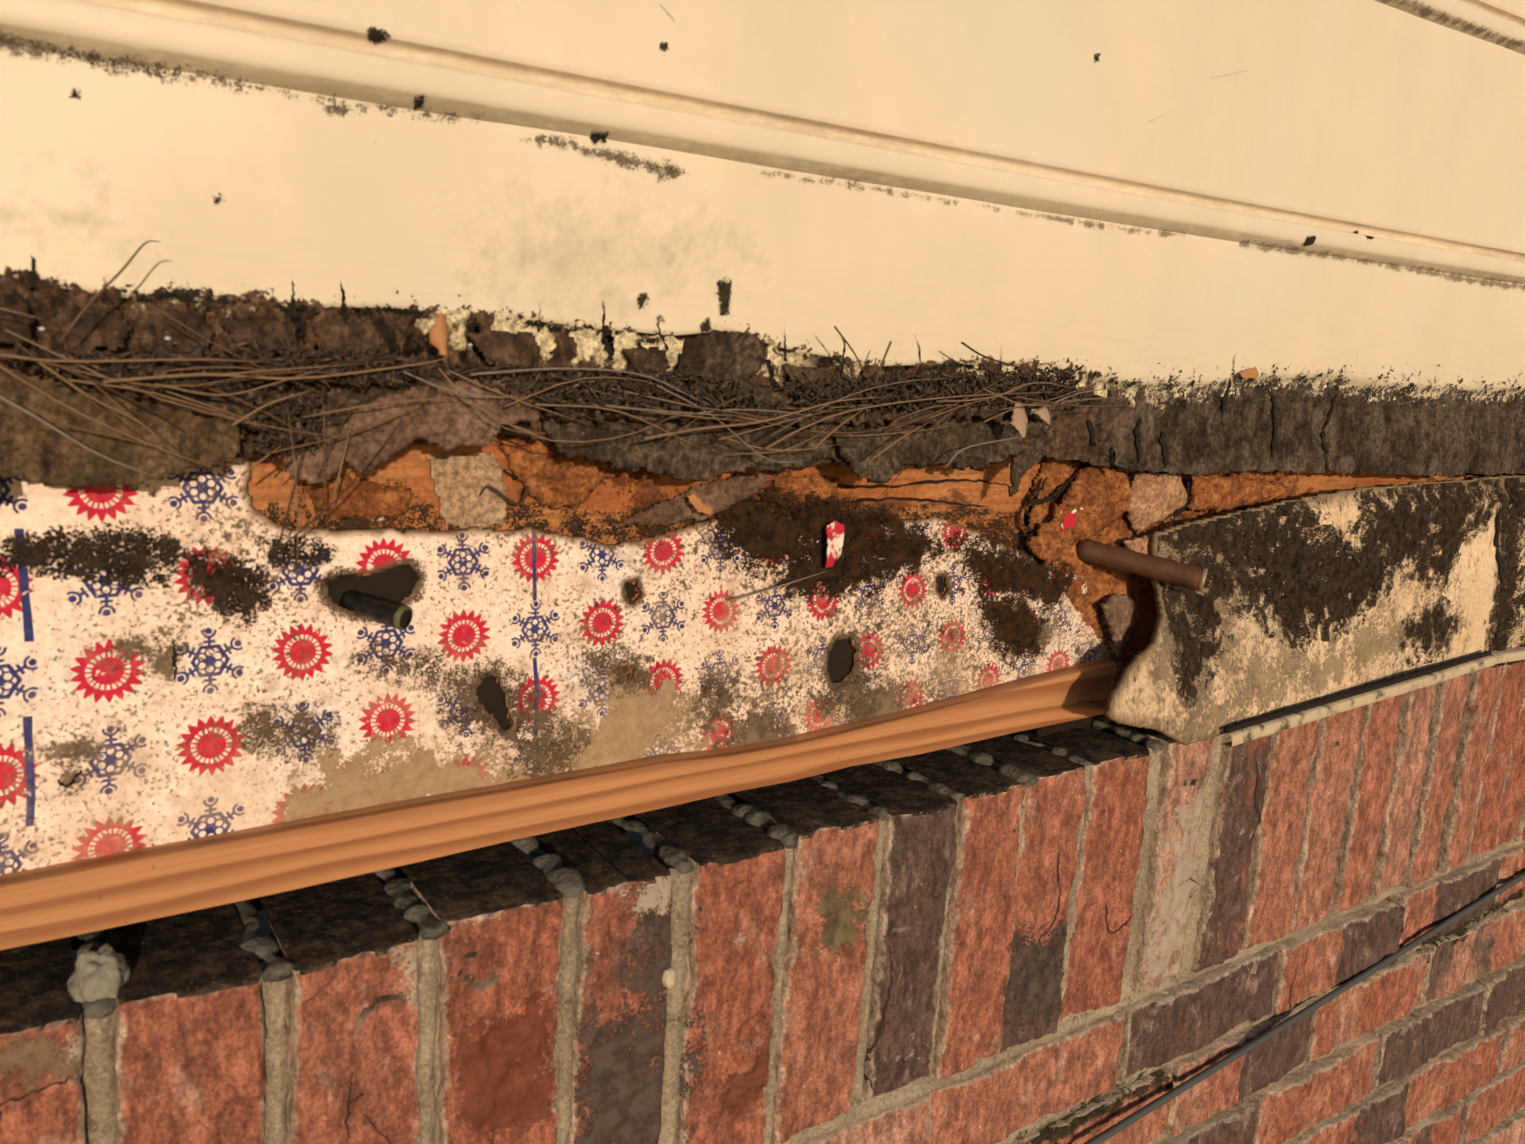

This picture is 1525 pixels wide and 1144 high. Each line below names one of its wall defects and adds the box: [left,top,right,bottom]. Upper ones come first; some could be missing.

water stain [0,24,479,122]
water stain [521,134,685,183]
peeling [0,291,34,345]
peeling [622,330,765,385]
water stain [0,471,467,630]
peeling [280,330,629,522]
water stain [486,467,1029,552]
peeling [773,474,841,503]
peeling [1008,420,1056,497]
water stain [1126,477,1525,740]
peeling [277,671,702,822]
peeling [720,706,804,747]